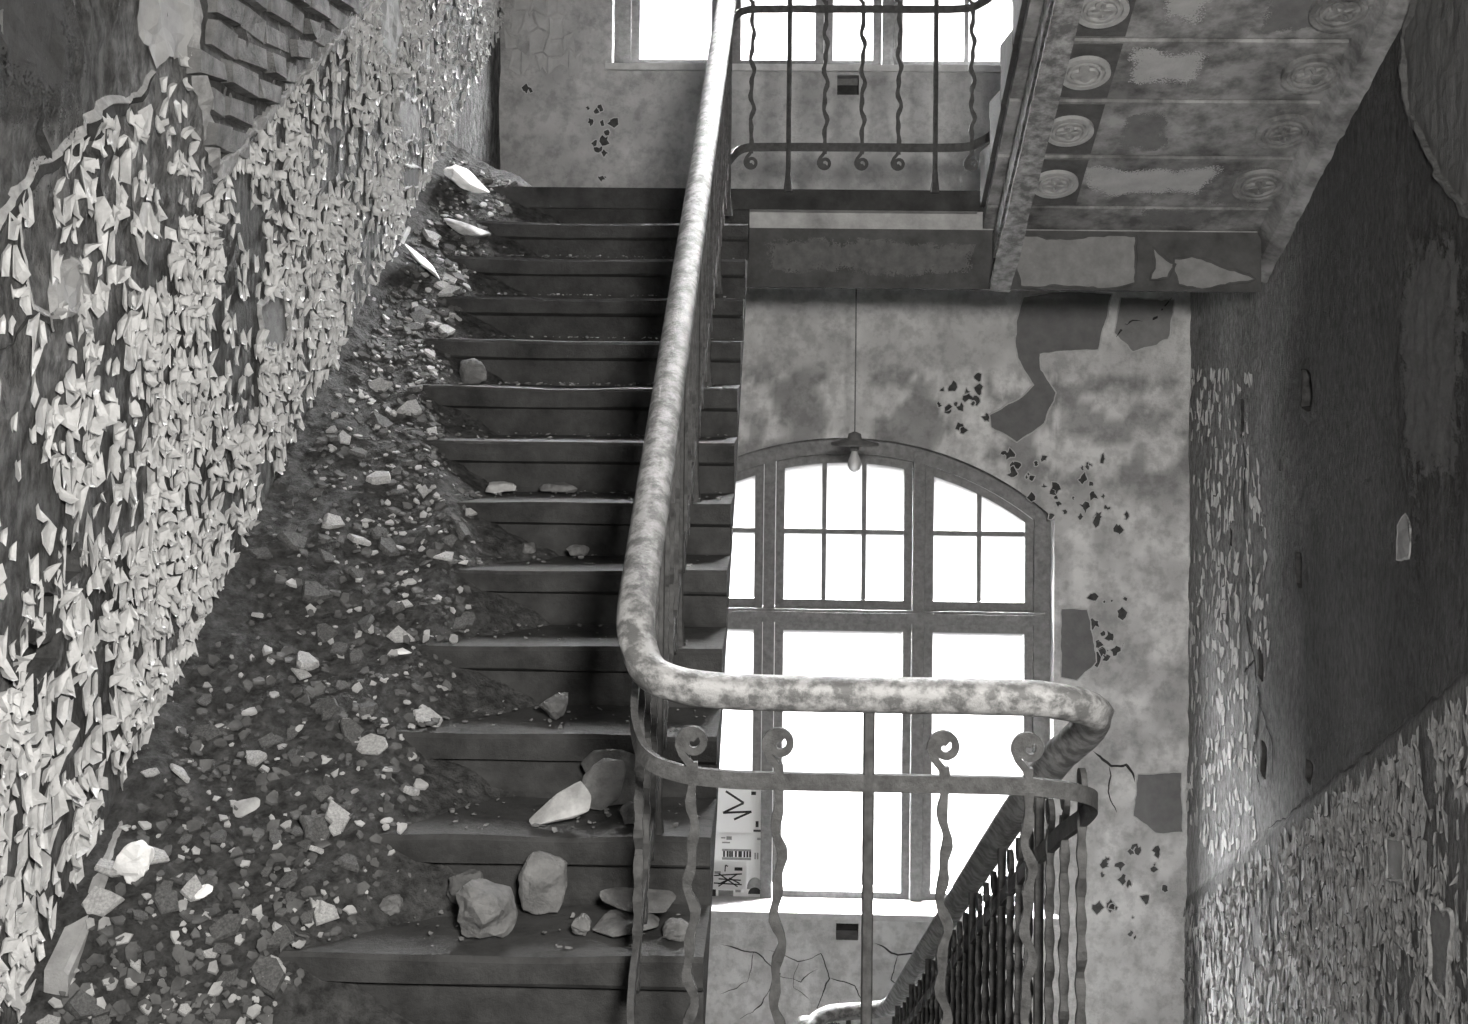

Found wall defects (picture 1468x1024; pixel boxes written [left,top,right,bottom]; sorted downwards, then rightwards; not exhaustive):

peeling [0,0,582,1024]
flaking render [936,233,1256,536]
peeling [1091,366,1468,1024]